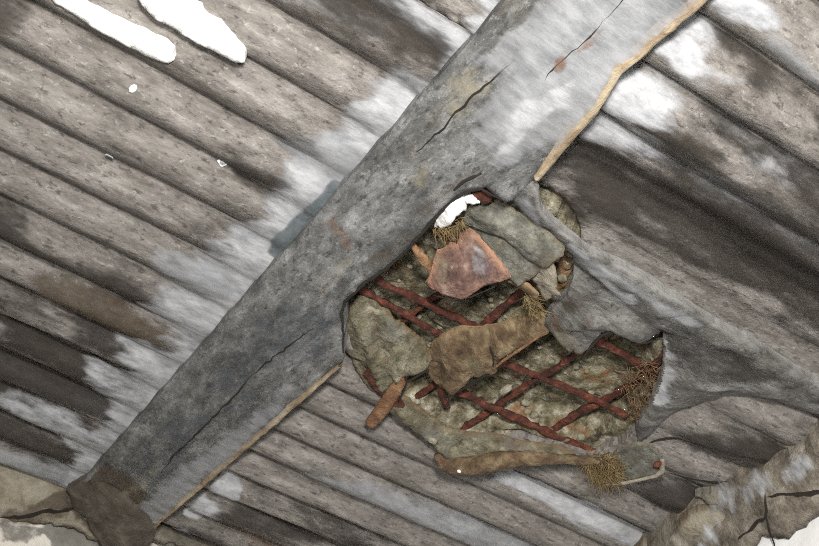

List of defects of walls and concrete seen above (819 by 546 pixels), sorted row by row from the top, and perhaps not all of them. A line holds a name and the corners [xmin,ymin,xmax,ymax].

crack [545,0,623,80]
crack [416,61,513,152]
damp [481,0,819,328]
spalling [539,184,581,238]
damp [0,0,500,546]
spalling [349,197,574,349]
spalling [401,330,666,482]
damp [653,341,769,405]
damp [677,428,787,466]
damp [495,469,649,546]
spalling [675,482,737,537]
crack [738,490,819,546]